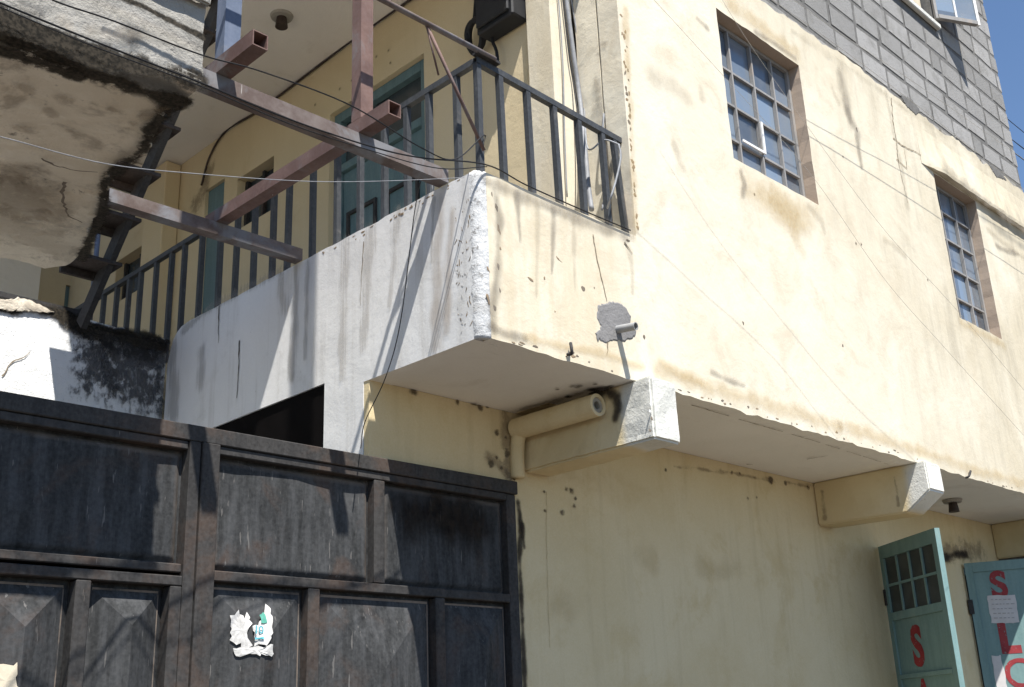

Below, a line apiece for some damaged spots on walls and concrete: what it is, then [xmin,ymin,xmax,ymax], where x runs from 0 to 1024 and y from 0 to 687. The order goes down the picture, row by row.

crack [891,98,919,202]
crack [41,158,92,223]
leakage [556,384,621,422]